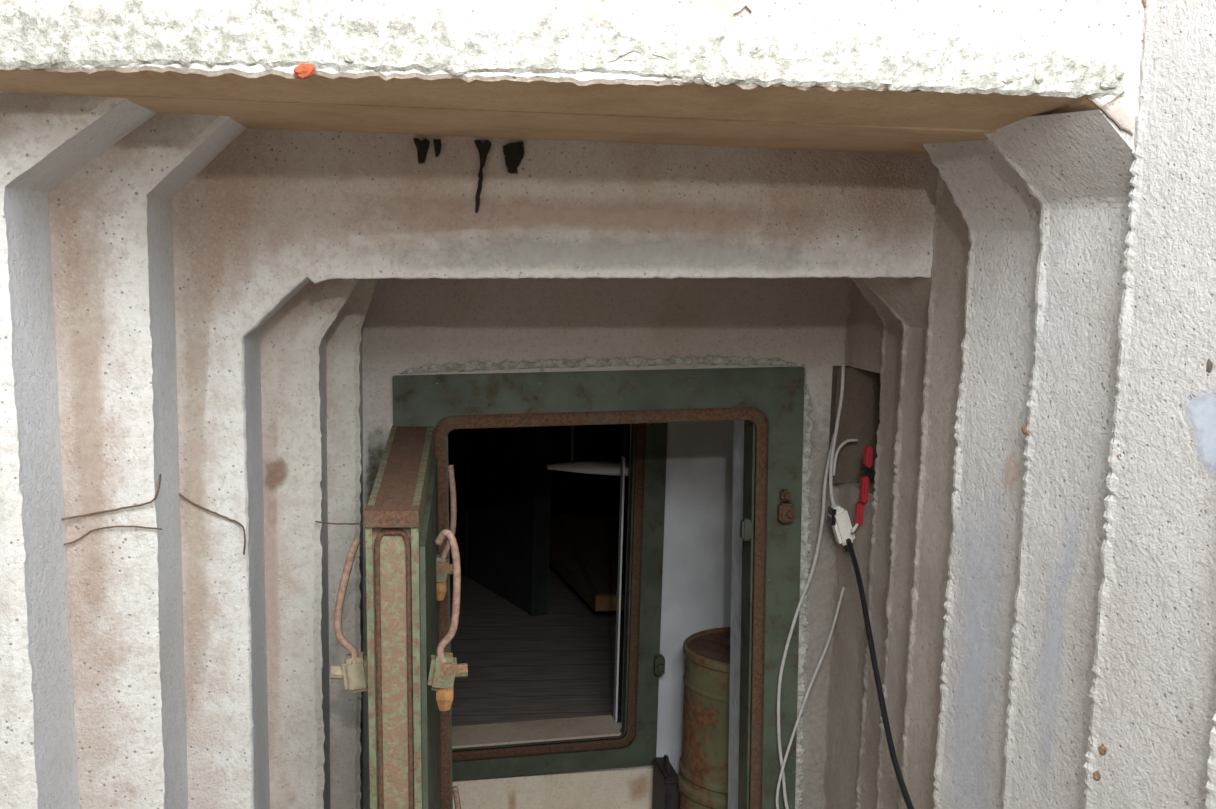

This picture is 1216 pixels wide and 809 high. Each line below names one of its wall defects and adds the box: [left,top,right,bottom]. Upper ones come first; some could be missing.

leakage [413,138,441,164]
leakage [474,140,525,213]
corrosion [433,407,769,809]